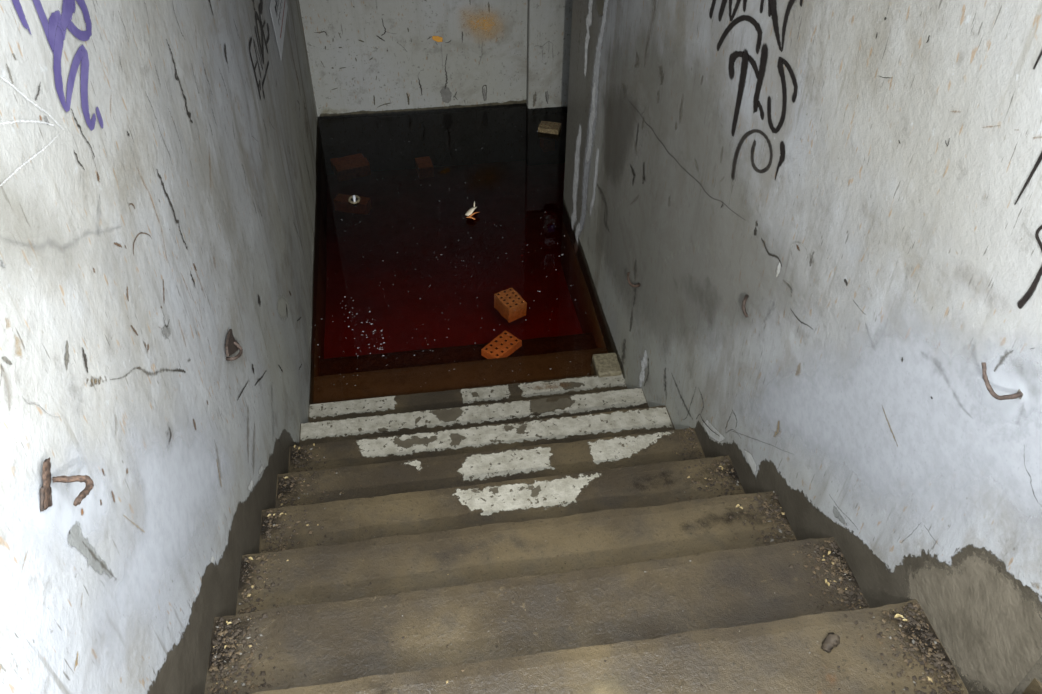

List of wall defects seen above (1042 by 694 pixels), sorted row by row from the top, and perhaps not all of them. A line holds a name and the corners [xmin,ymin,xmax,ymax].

crack [110,359,190,380]
damp [562,197,626,378]
damp [639,349,649,388]
crack [628,100,812,329]
damp [147,430,300,694]
damp [664,368,1042,694]